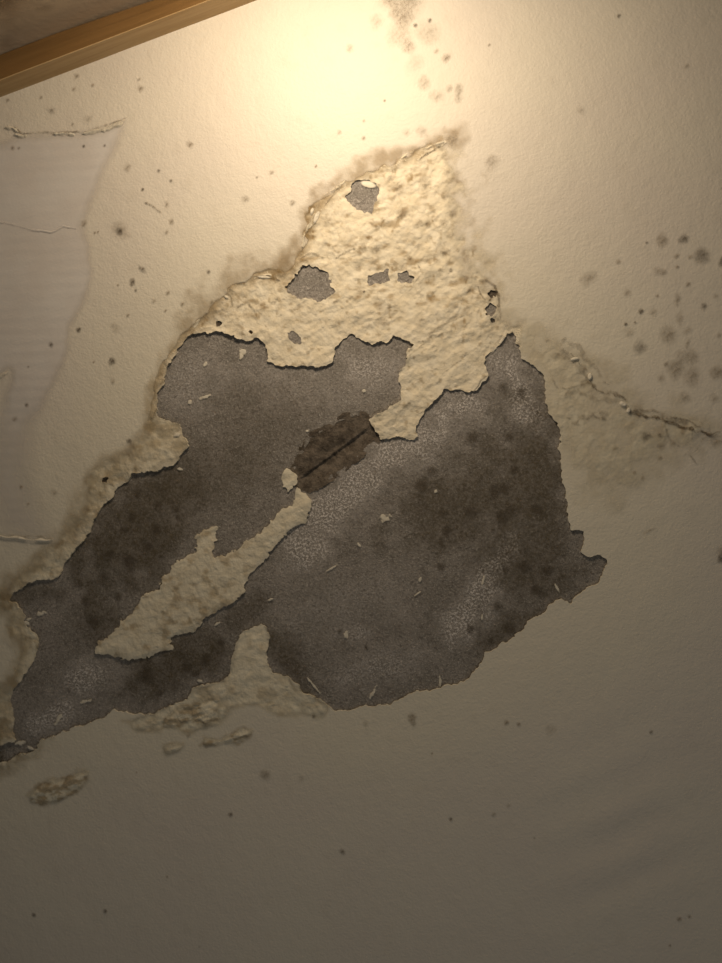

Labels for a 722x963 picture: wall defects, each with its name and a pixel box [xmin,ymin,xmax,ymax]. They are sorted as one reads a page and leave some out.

flaking render [0,141,704,770]
crack [571,357,711,436]